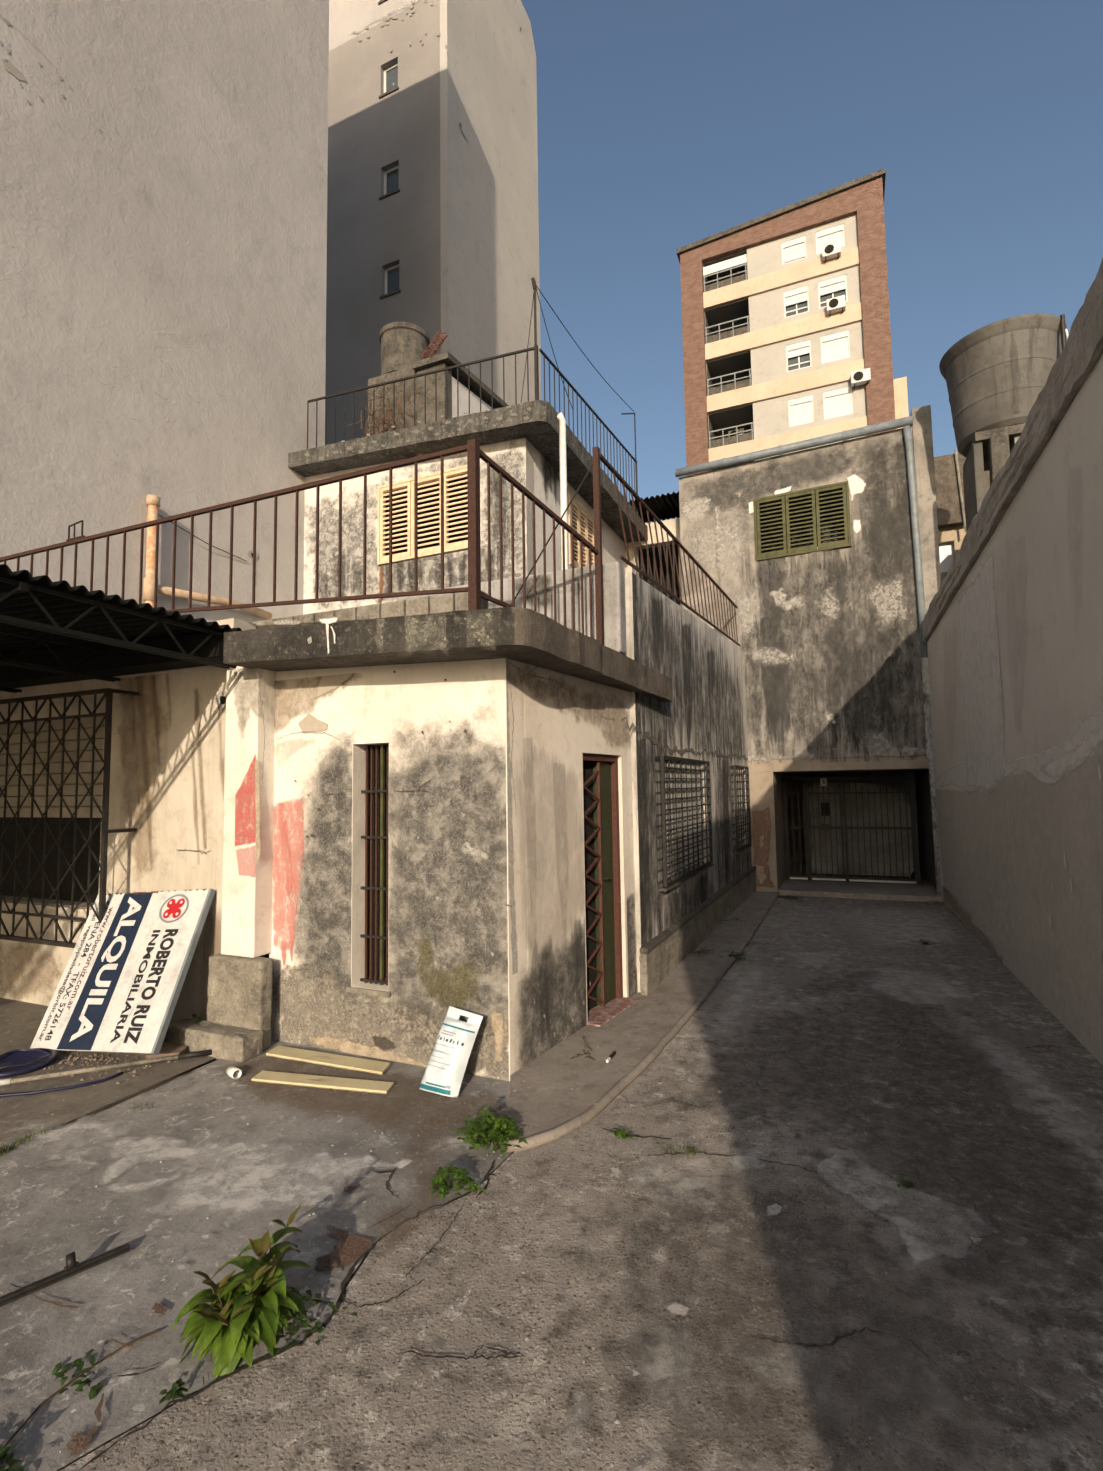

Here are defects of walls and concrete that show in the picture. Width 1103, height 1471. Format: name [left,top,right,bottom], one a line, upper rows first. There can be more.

flaking render [0,18,42,103]
water stain [279,742,368,1003]
water stain [388,726,591,1066]
water stain [509,437,924,997]